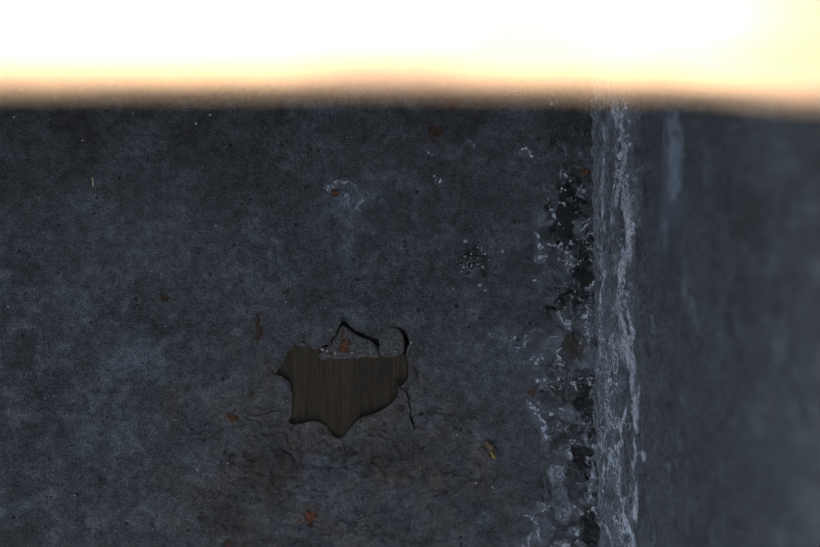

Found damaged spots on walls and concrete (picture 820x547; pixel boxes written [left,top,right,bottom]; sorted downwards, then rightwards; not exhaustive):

peeling [317,325,405,360]
leakage [522,94,645,547]